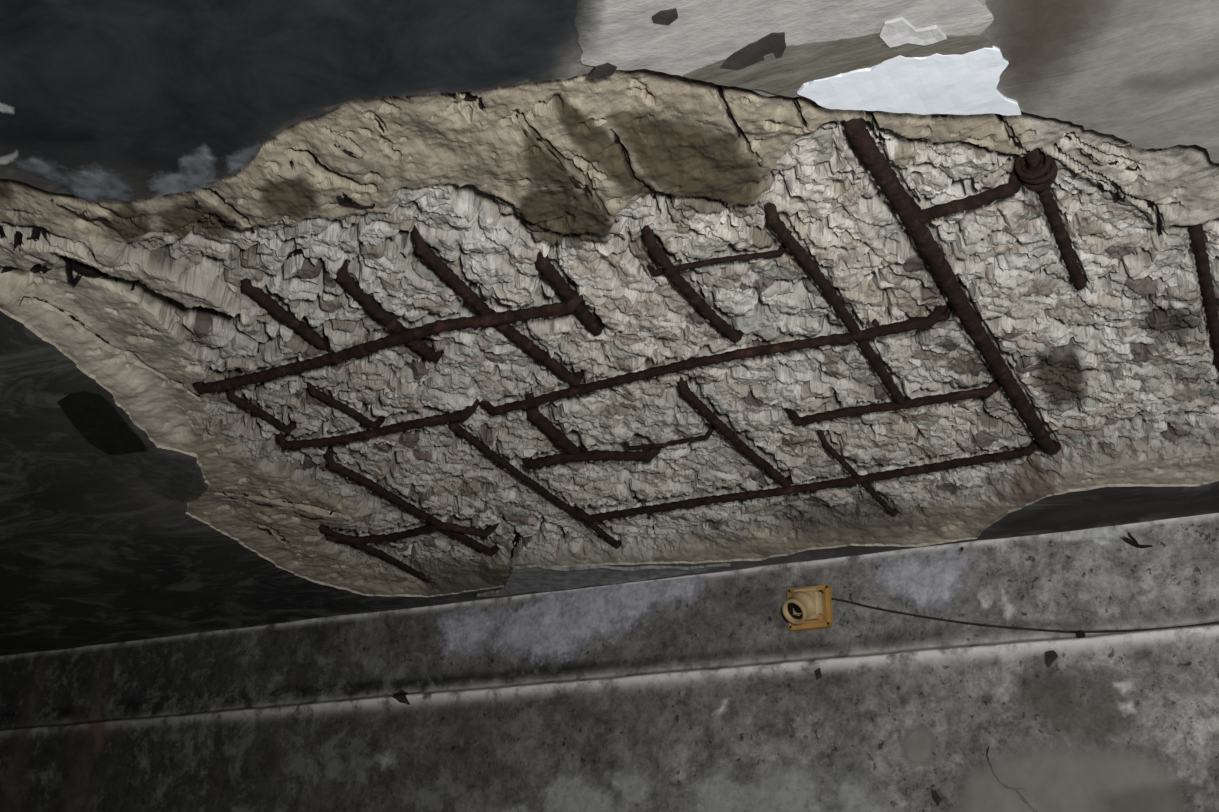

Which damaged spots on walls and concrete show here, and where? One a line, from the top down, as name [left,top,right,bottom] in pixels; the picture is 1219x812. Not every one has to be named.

corrosion [259,179,316,217]
spalling [0,0,1219,598]
corrosion [1146,306,1192,343]
corrosion [1036,343,1086,404]
peeling [978,585,1015,619]